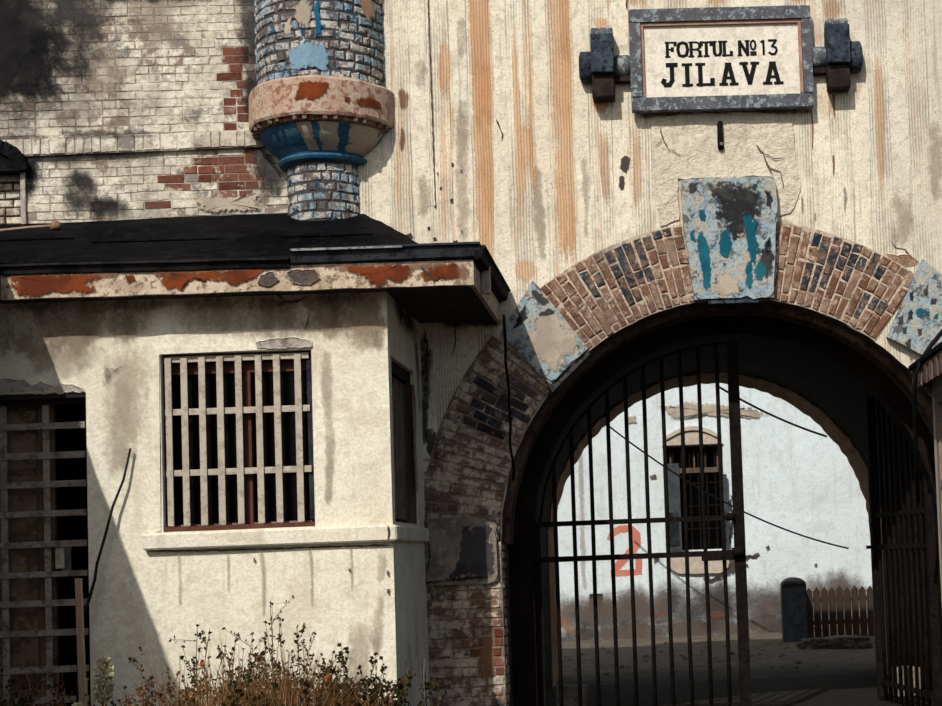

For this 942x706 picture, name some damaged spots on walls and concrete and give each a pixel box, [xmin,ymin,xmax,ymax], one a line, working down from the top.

peeling [361,0,374,21]
peeling [284,0,329,100]
flaking render [216,47,249,131]
flaking render [145,148,264,213]
crack [756,145,784,187]
peeling [688,181,775,296]
peeling [6,274,100,297]
spalling [160,268,320,291]
peeling [898,285,939,351]
peeling [449,524,494,581]
spalling [721,545,770,575]